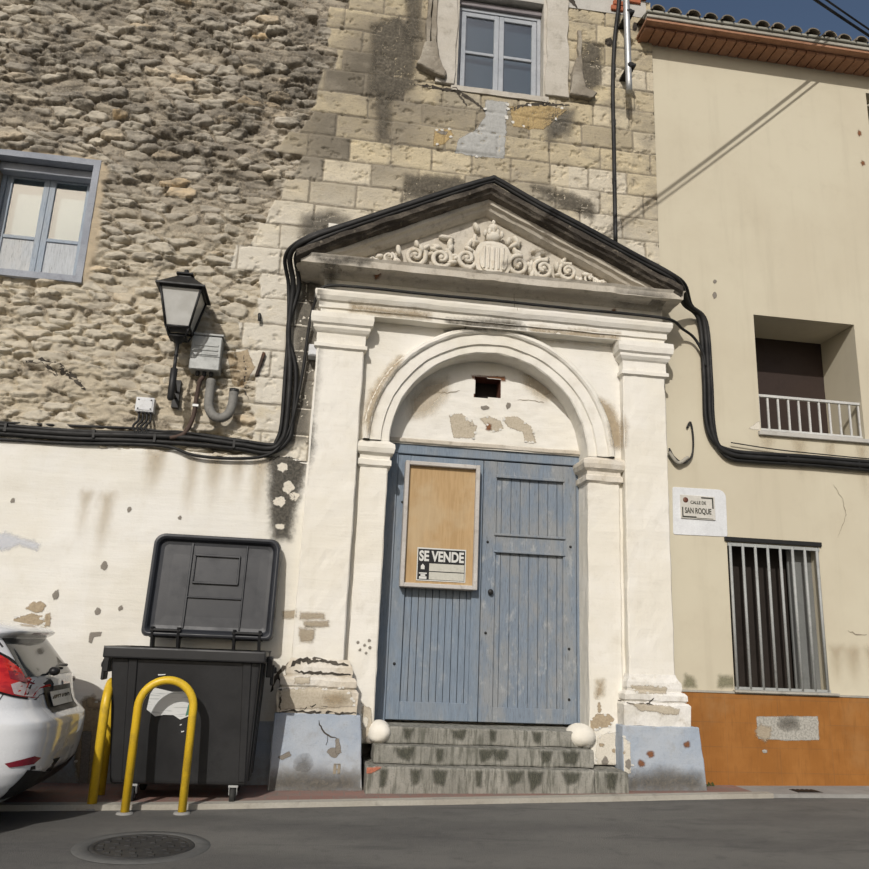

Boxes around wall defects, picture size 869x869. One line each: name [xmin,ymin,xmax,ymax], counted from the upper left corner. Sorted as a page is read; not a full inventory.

leakage [370,0,420,139]
crack [410,83,570,111]
spalling [504,103,566,130]
crack [23,357,86,390]
peeling [449,403,536,444]
peeling [11,590,59,627]
crack [270,657,356,744]
spalling [360,703,373,744]
peeling [756,716,819,753]